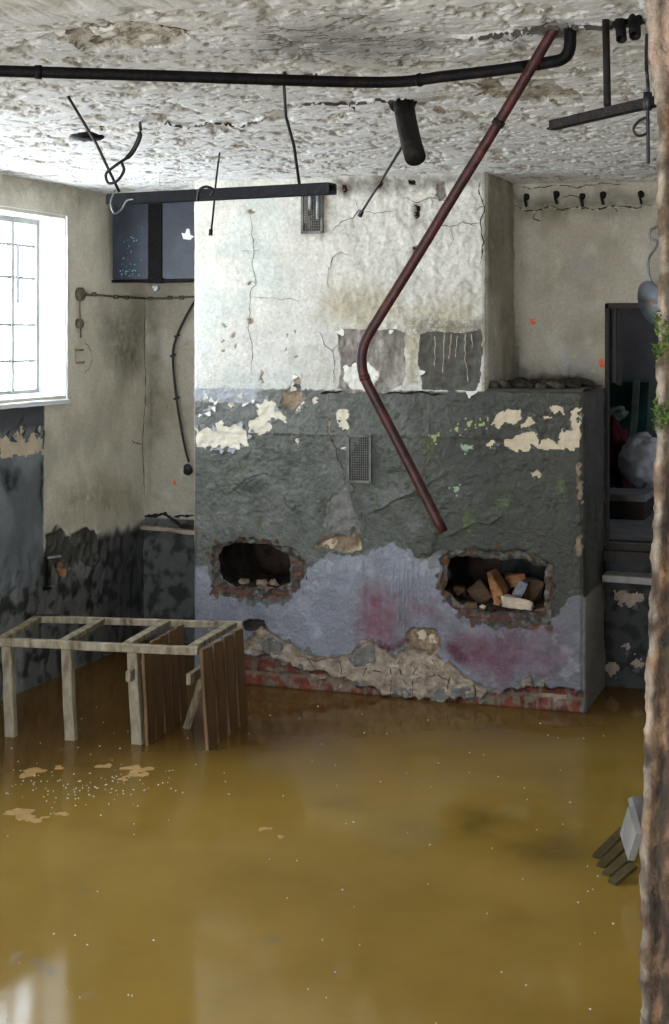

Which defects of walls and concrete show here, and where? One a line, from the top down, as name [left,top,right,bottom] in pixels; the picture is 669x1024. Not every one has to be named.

crack [327,180,485,287]
crack [513,182,653,221]
crack [246,216,297,367]
peeling [336,324,425,393]
peeling [0,417,45,459]
peeling [194,370,319,454]
peeling [484,405,584,505]
flaking render [315,477,365,553]
flaking render [205,537,307,601]
flaking render [435,544,556,633]
peeling [613,590,644,610]
flaking render [243,619,584,714]